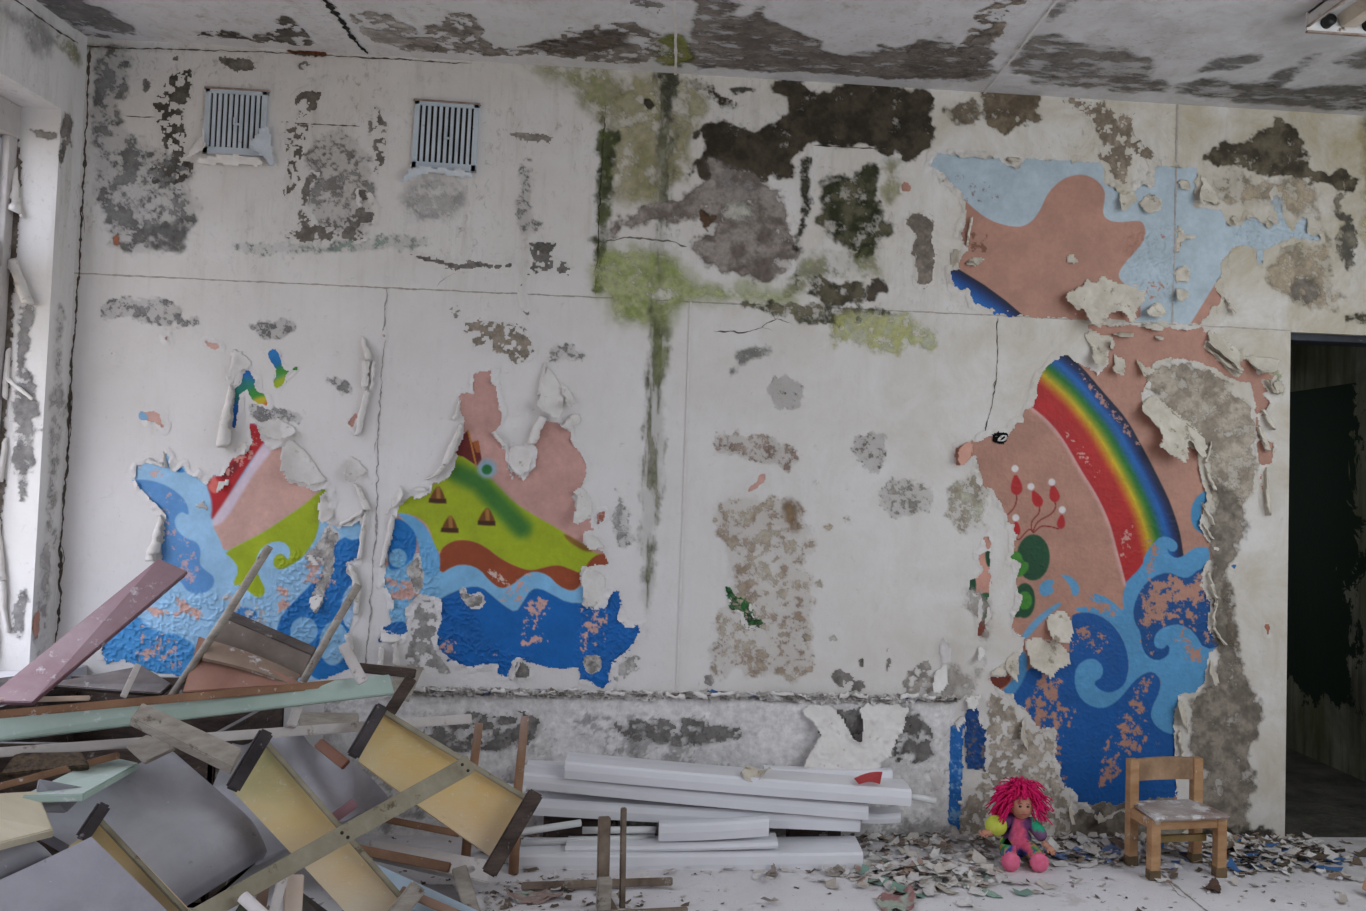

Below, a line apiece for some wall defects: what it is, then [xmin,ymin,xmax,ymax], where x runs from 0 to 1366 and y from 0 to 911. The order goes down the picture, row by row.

peeling [142,16,380,245]
water stain [610,0,1366,328]
peeling [955,0,1027,52]
crack [15,0,461,663]
water stain [613,498,630,545]
water stain [645,542,655,597]
water stain [642,306,668,520]
peeling [95,97,1327,837]